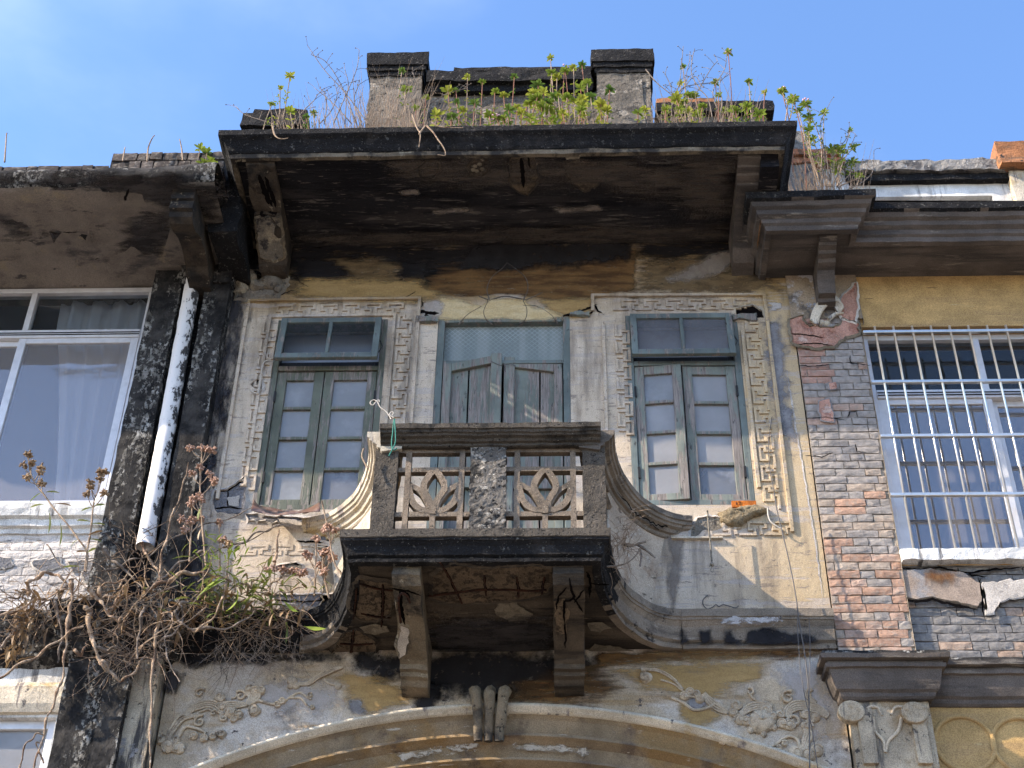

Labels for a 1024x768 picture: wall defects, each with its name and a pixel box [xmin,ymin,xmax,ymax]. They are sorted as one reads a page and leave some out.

leakage [284,156,783,303]
spalling [787,282,861,351]
spalling [210,475,335,610]
crack [617,492,668,530]
crack [392,588,421,625]
crack [555,572,609,648]
peeling [899,568,1024,616]
leakage [414,683,442,708]
leakage [509,628,821,706]